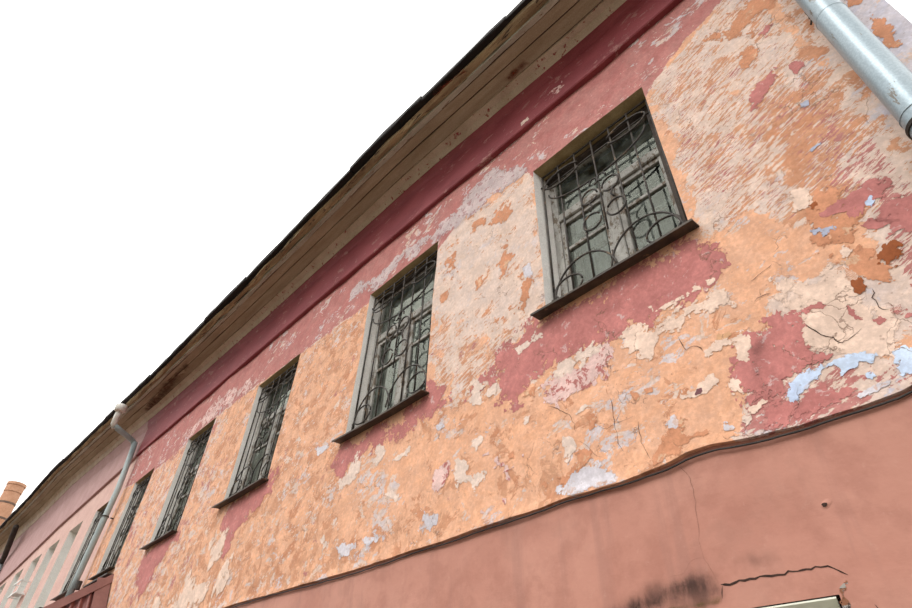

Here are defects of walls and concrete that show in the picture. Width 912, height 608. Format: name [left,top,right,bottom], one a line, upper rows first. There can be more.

peeling [701,0,775,69]
peeling [869,14,903,49]
peeling [749,60,805,112]
peeling [463,234,737,425]
peeling [680,175,912,431]
peeling [315,379,452,490]
peeling [432,435,524,492]
peeling [542,436,616,495]
peeling [652,414,710,466]
peeling [320,533,379,559]
peeling [418,511,438,534]
crack [675,468,848,593]